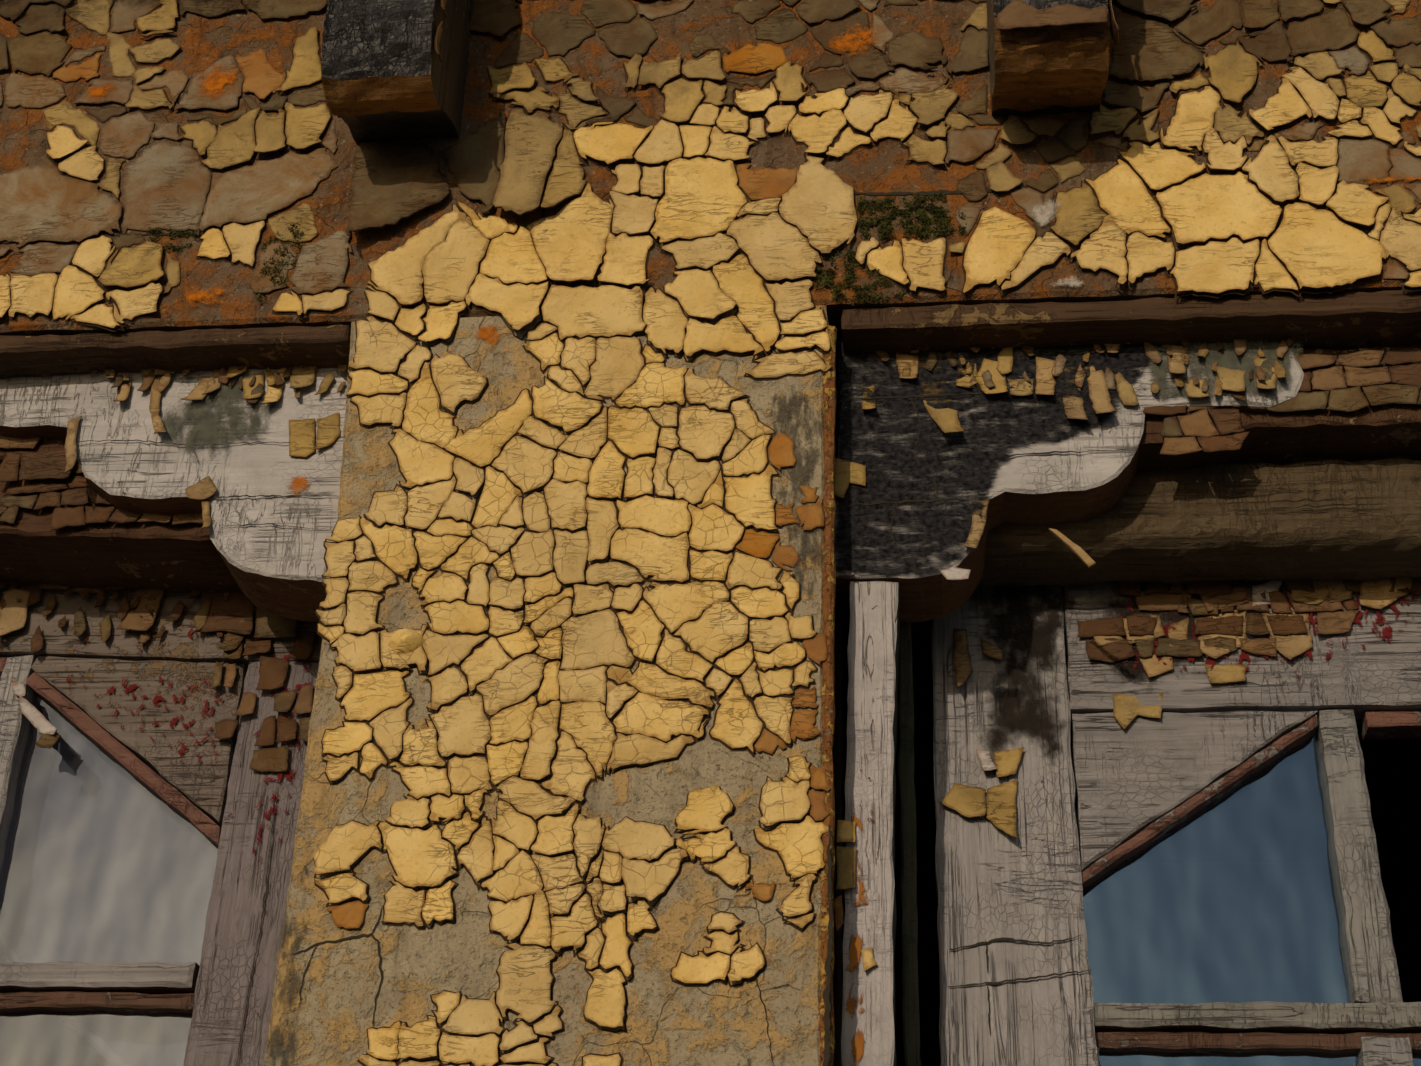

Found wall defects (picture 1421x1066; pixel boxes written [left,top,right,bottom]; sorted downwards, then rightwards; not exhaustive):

peeling [0,0,450,332]
peeling [949,0,1421,298]
peeling [0,416,217,530]
peeling [91,367,199,434]
peeling [181,0,1088,1066]
peeling [875,338,1421,456]
peeling [11,678,61,749]
peeling [0,581,185,644]
water stain [972,585,1074,757]
peeling [1077,577,1421,730]